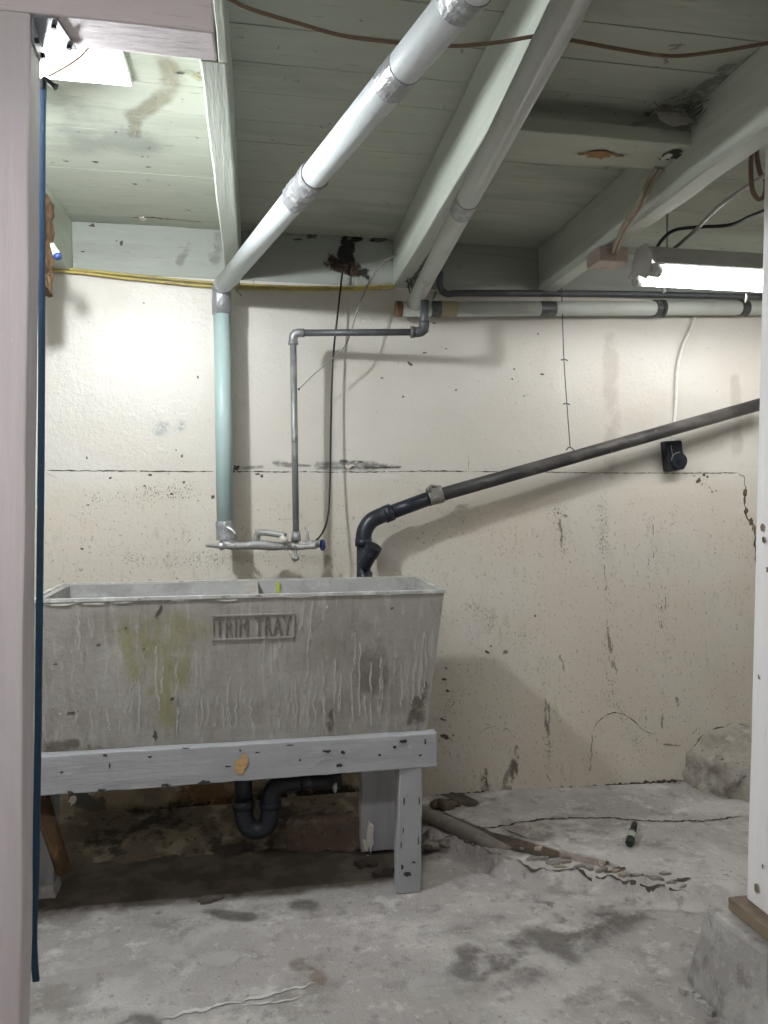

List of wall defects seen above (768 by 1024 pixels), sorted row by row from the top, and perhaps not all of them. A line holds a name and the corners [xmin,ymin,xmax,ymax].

rust [324,254,361,277]
crack [46,458,499,478]
crack [547,471,756,563]
crack [561,712,684,787]
crack [441,816,737,893]